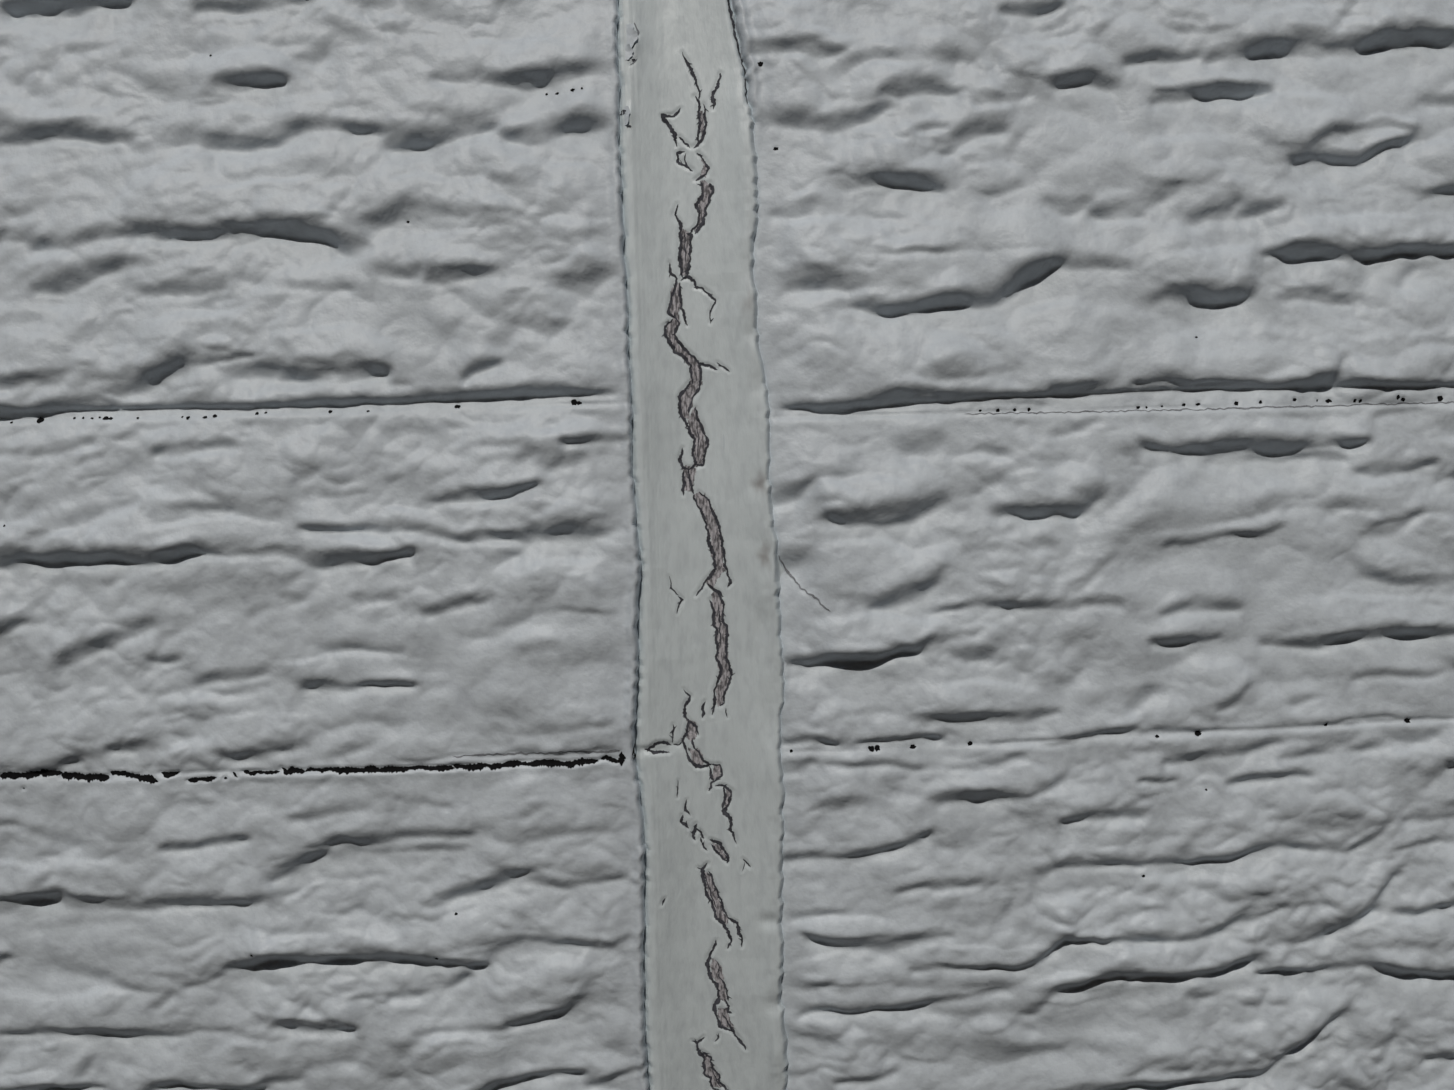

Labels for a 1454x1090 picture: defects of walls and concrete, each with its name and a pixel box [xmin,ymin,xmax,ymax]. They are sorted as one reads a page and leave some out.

crack [454,0,751,1090]